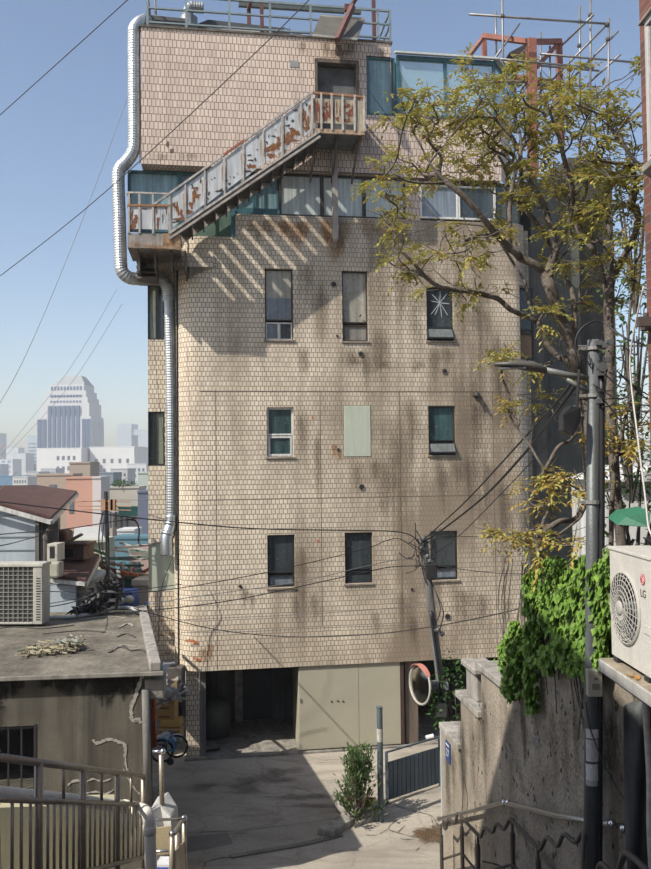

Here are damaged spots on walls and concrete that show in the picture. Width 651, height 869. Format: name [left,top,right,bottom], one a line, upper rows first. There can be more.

crack [1,616,146,653]
water stain [0,681,25,721]
water stain [38,677,140,705]
crack [129,676,144,724]
crack [67,738,140,795]